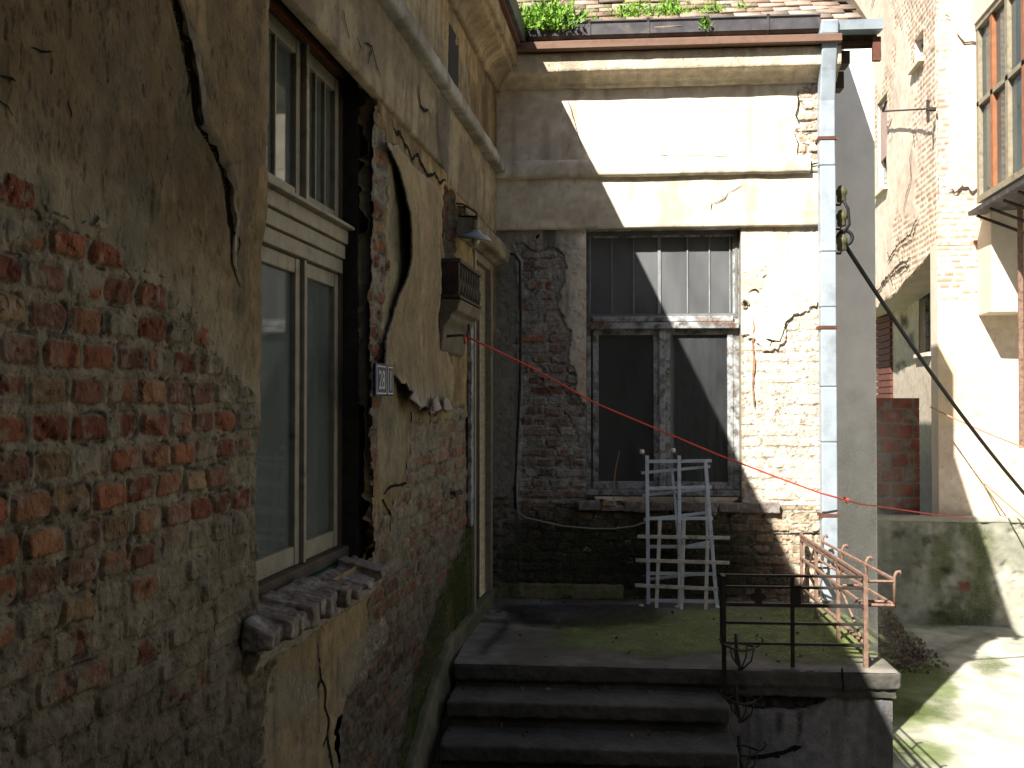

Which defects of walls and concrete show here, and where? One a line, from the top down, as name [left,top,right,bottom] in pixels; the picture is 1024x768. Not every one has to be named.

crack [173,0,244,288]
crack [391,118,446,185]
flaking render [794,83,818,165]
crack [877,129,918,291]
flaking render [0,173,277,768]
flaking render [493,243,830,602]
crack [317,644,334,768]